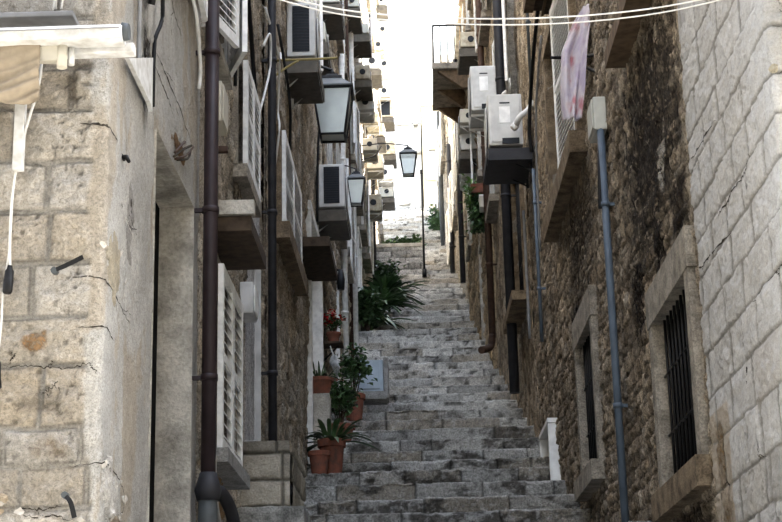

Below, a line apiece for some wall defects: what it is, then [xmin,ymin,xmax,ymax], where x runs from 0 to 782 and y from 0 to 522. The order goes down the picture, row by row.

crack [81,122,131,161]
leakage [622,0,688,334]
crack [73,275,131,323]
crack [4,352,97,398]
crack [22,505,61,516]